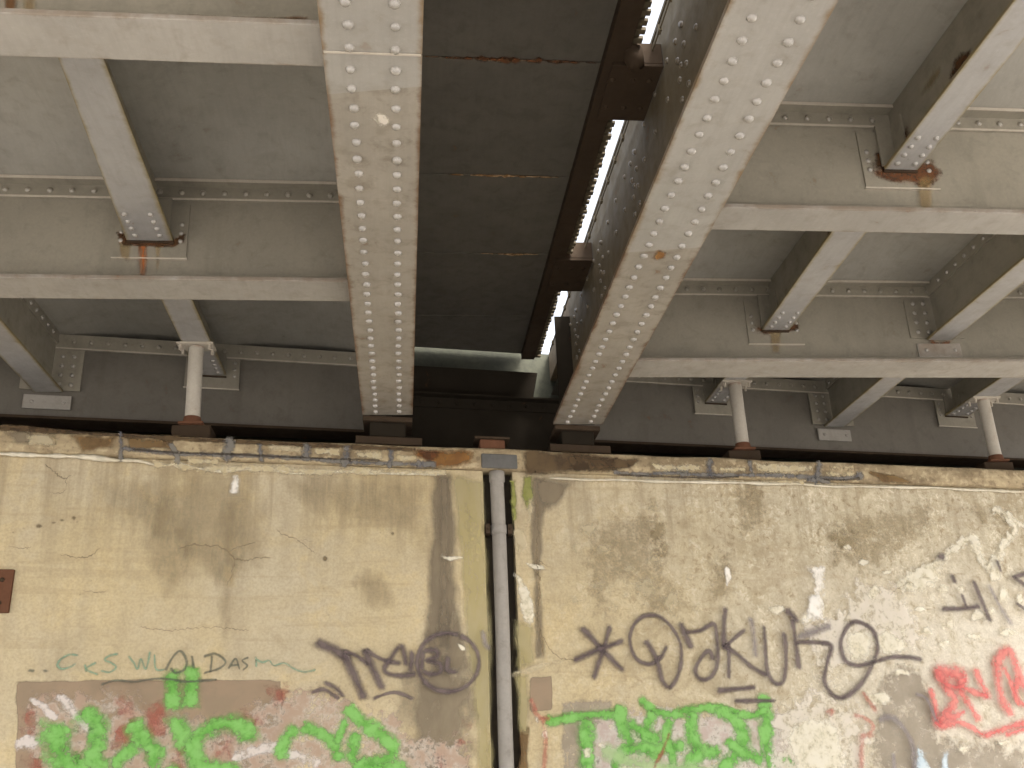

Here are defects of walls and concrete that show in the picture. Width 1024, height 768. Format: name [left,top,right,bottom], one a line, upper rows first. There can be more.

corrosion [873,153,943,188]
corrosion [116,232,185,275]
corrosion [416,450,473,467]
leakage [410,475,491,768]
leakage [511,450,638,768]
peeling [801,507,1024,673]
peeling [770,684,871,768]
peeling [868,693,890,705]